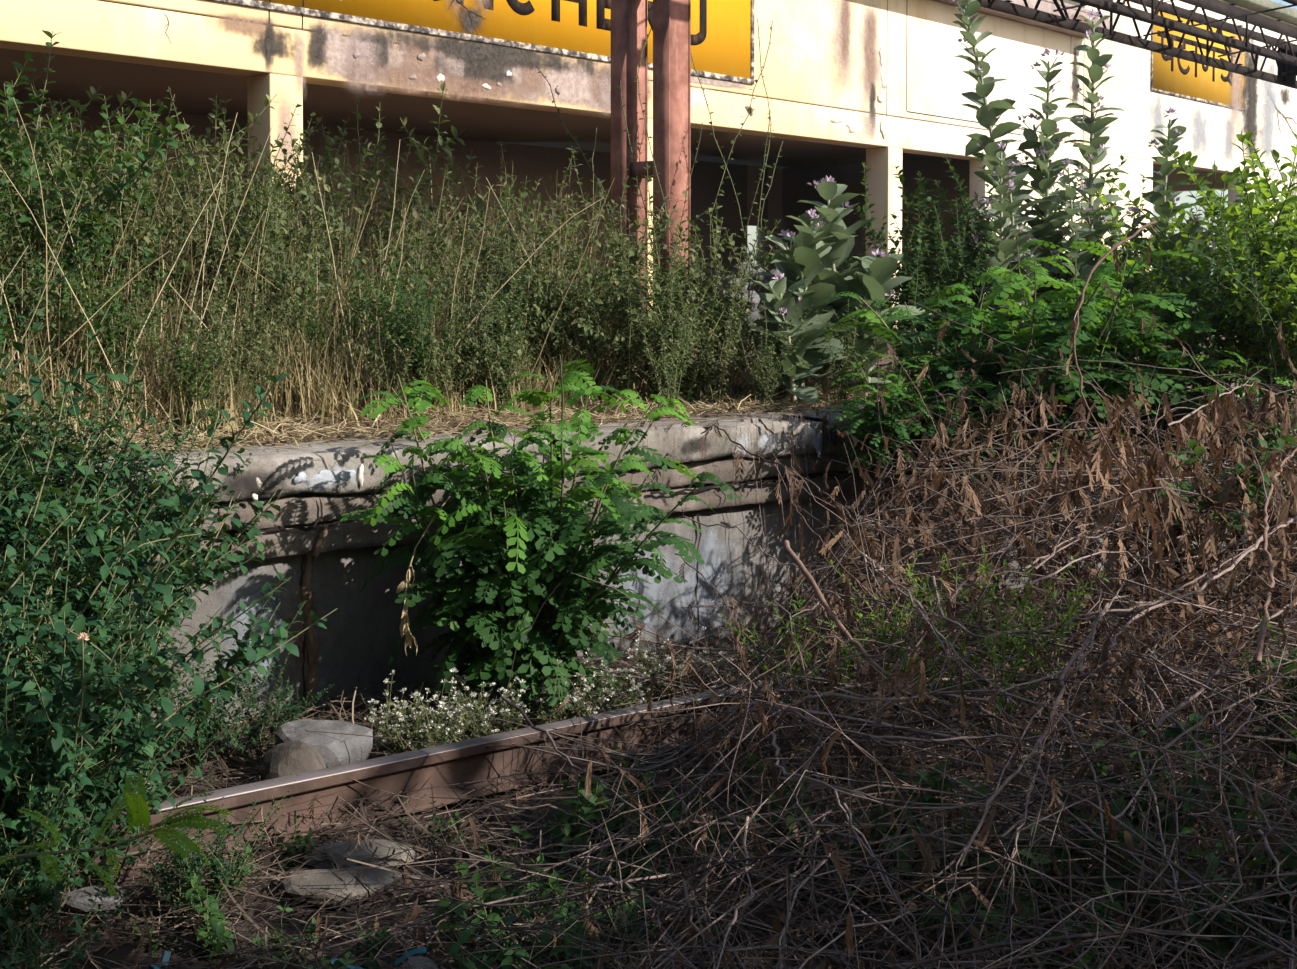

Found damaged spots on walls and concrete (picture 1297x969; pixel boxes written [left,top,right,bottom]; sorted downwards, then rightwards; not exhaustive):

damp [454,0,486,33]
damp [836,3,880,127]
damp [1193,111,1206,150]
damp [1226,40,1290,157]